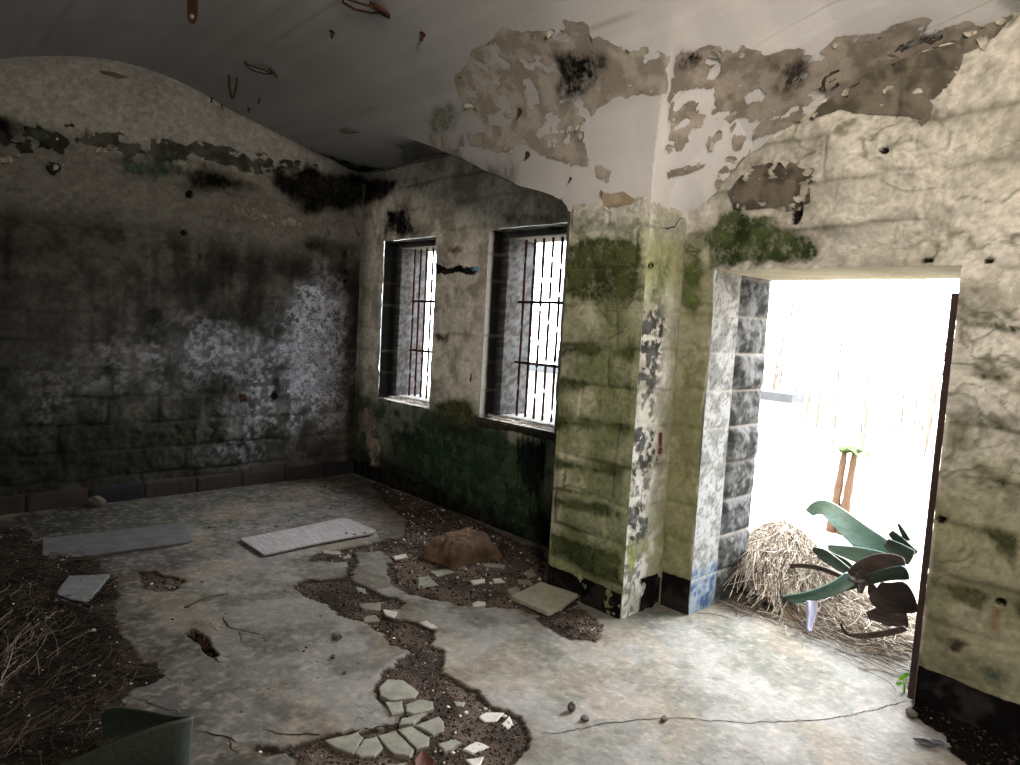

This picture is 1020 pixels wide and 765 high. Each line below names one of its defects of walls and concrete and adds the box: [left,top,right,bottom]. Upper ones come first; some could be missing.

peeling [428,15,1013,224]